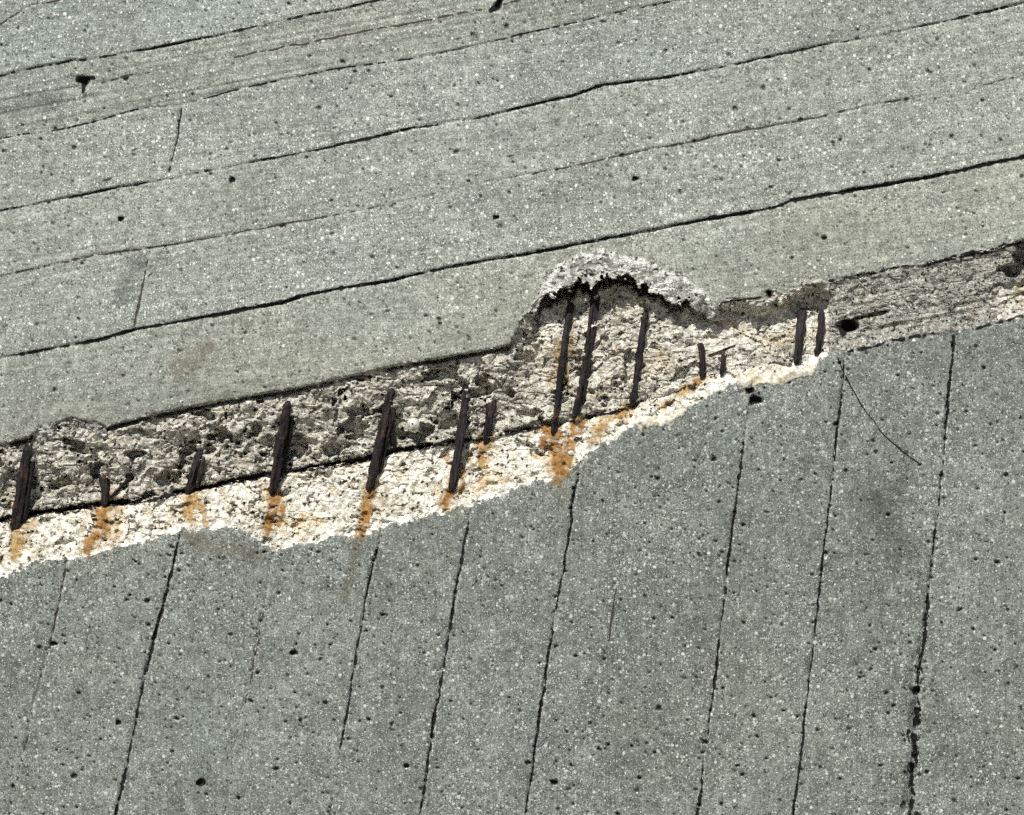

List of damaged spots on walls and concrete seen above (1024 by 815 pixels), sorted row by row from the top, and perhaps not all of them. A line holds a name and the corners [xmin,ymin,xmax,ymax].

crack [0,0,520,83]
crack [0,33,920,200]
crack [7,154,1024,356]
spalling [984,275,1024,320]
corrosion [84,506,121,557]
corrosion [264,490,285,534]
corrosion [357,488,375,536]
spalling [0,274,859,578]
corrosion [442,457,465,506]
corrosion [540,409,628,485]
crack [792,314,1024,815]
crack [115,542,178,815]